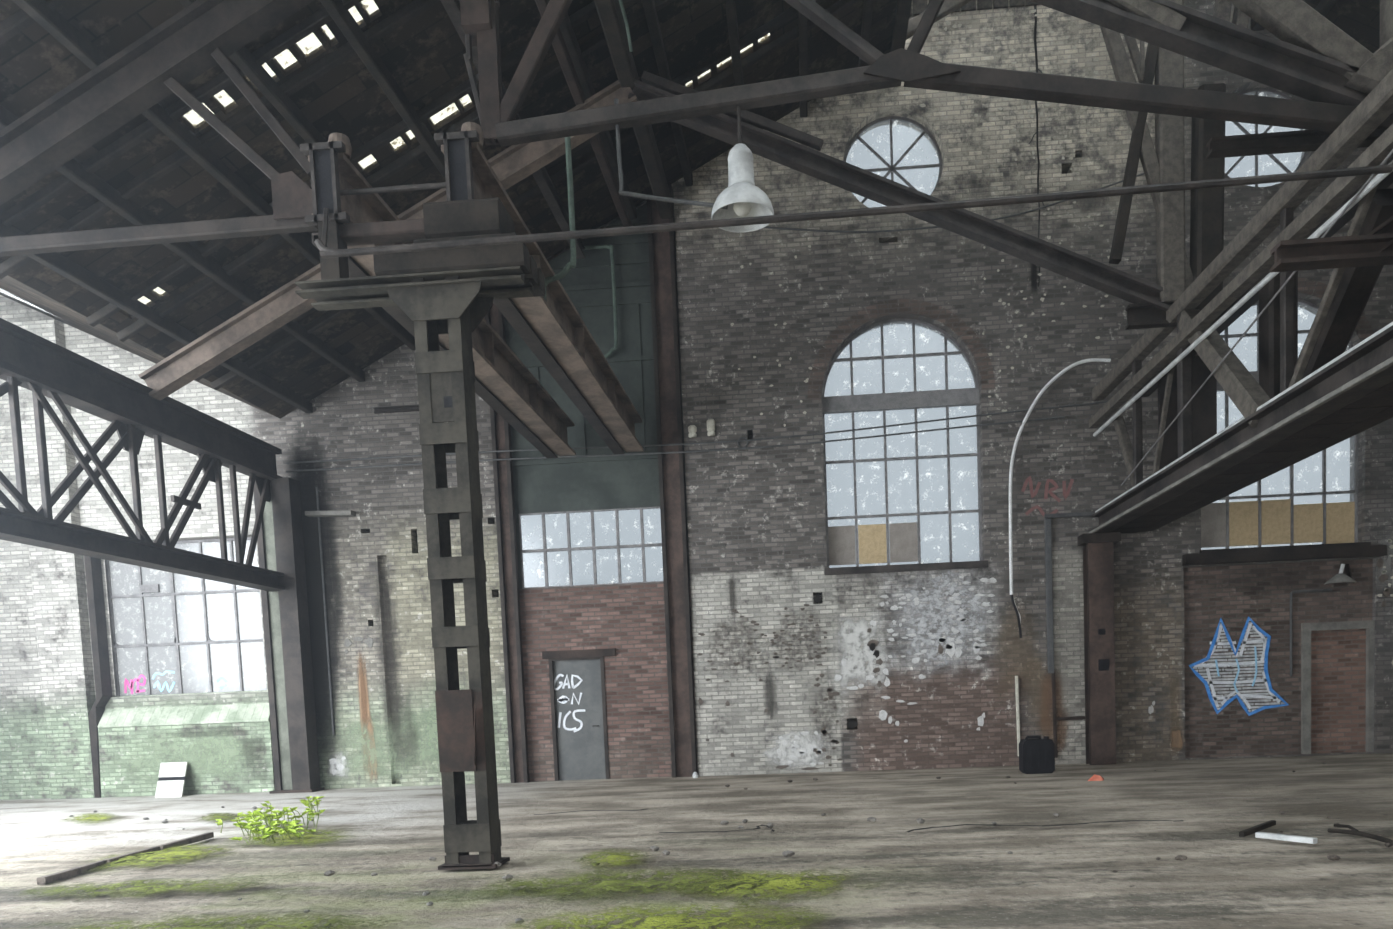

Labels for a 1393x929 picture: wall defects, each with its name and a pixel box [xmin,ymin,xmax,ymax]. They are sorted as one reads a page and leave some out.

peeling [698,573,997,770]